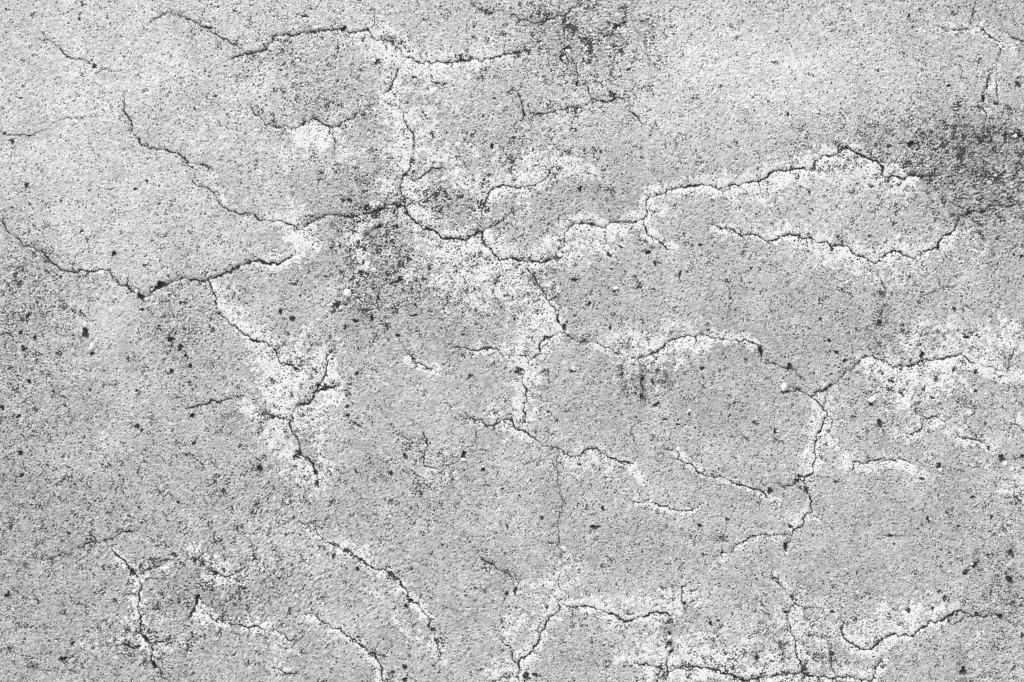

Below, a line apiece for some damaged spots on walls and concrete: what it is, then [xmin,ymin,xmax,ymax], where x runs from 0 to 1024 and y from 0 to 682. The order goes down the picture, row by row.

crack [2,115,102,136]
crack [41,31,115,72]
crack [122,96,209,170]
crack [150,1,1023,552]
crack [1,221,341,487]
crack [2,529,297,682]
crack [304,613,384,682]
crack [297,520,441,668]
crack [391,377,687,682]
crack [636,566,997,682]